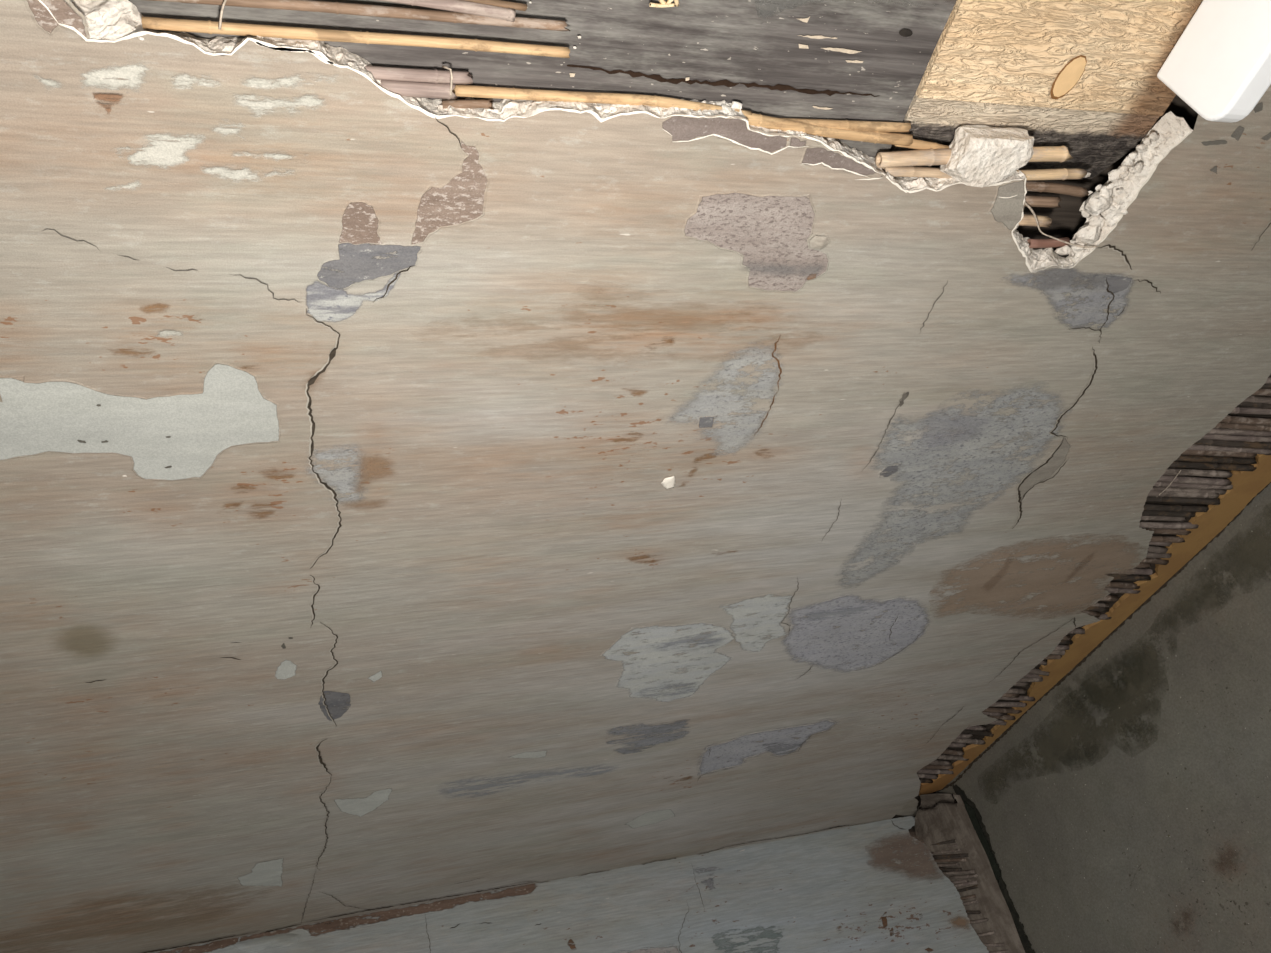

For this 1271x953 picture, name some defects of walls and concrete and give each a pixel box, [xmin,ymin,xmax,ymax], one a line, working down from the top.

spalling [23,0,970,193]
crack [377,266,413,299]
peeling [306,136,490,322]
peeling [682,191,831,293]
peeling [988,111,1244,330]
crack [144,274,610,953]
peeling [670,347,778,453]
crack [754,334,782,436]
crack [862,392,909,471]
peeling [840,387,1072,585]
leakage [932,536,1139,618]
crack [1012,244,1161,529]